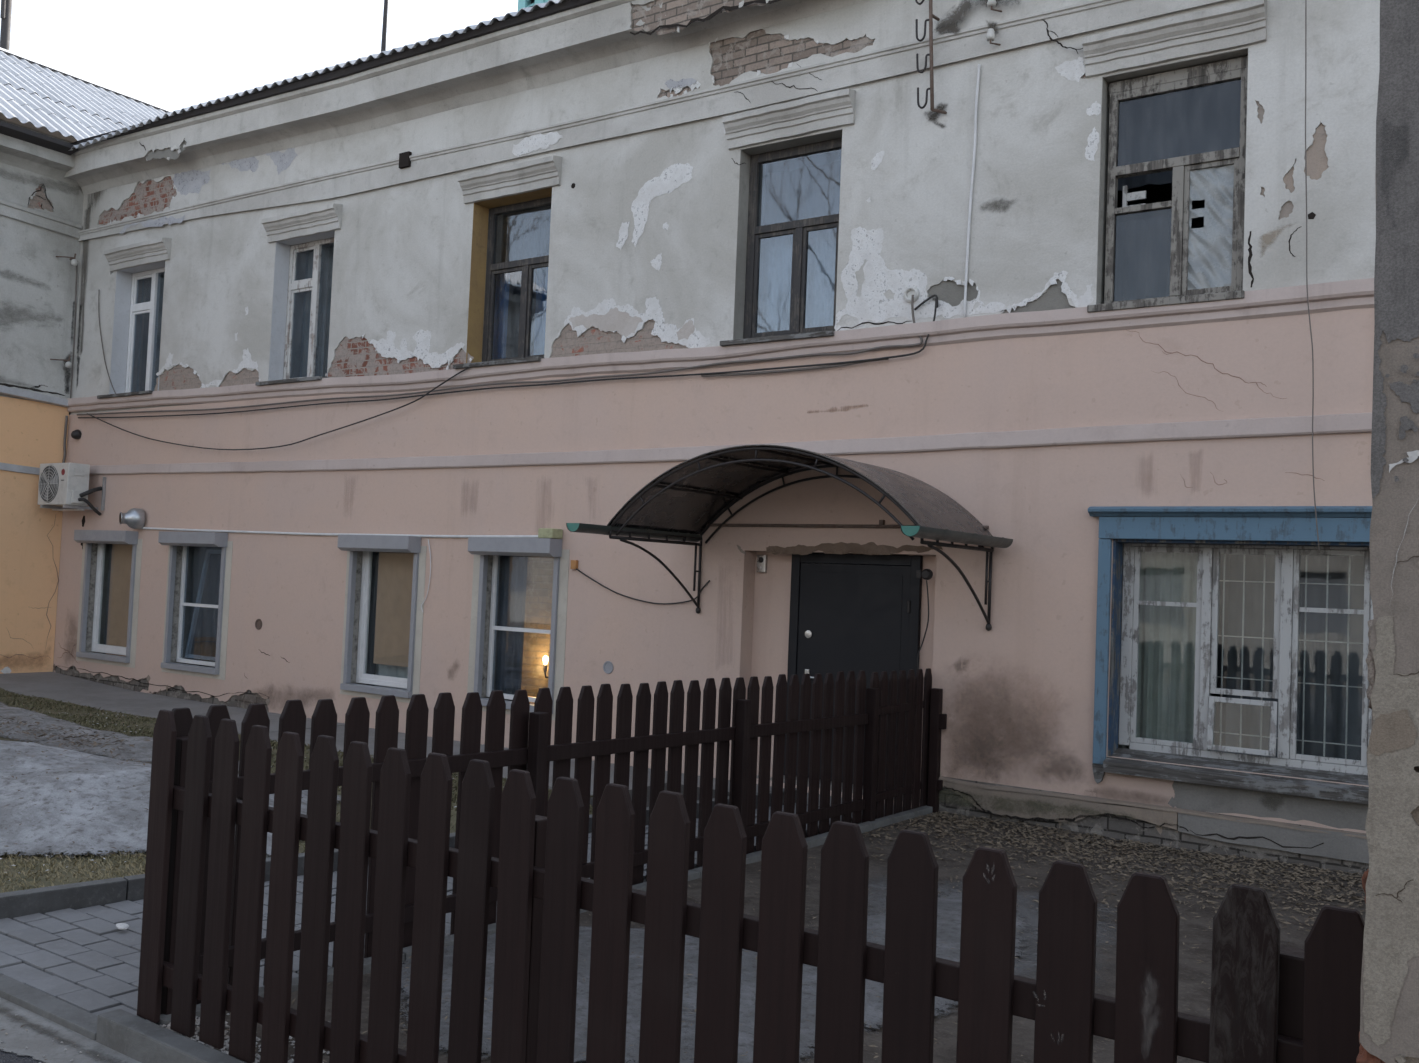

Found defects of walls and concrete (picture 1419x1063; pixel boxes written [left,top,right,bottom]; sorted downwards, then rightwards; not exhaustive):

spalling [658,29,874,98]
spalling [28,183,53,212]
spalling [99,144,297,234]
peeling [512,132,564,157]
peeling [616,163,693,250]
spalling [1279,123,1329,220]
peeling [834,226,1094,331]
spalling [154,332,261,391]
spalling [325,329,474,378]
spalling [550,297,710,358]
crack [1127,330,1286,406]
peeling [1356,616,1419,1063]